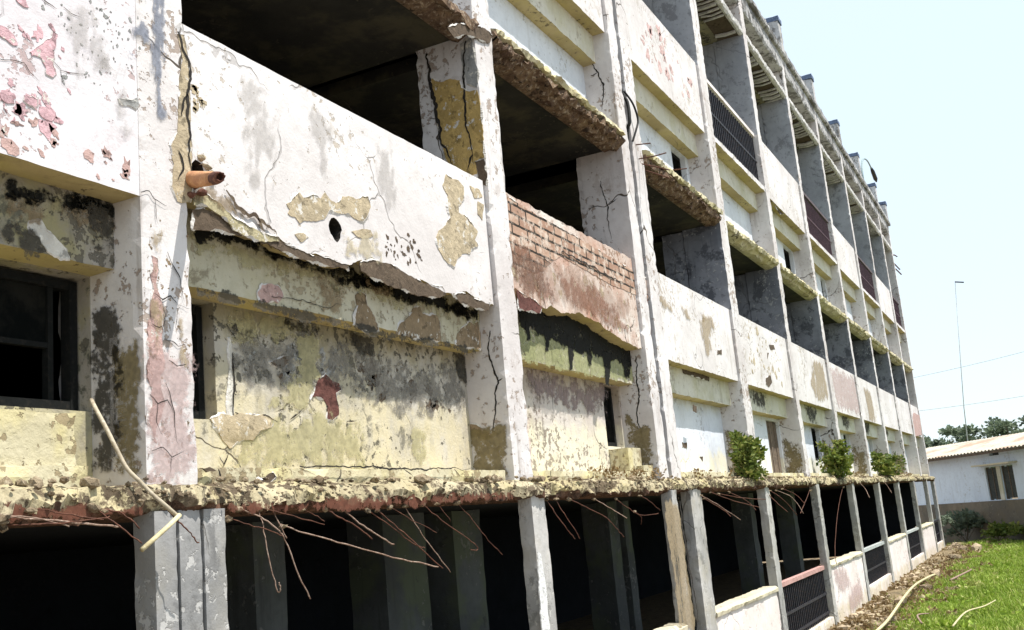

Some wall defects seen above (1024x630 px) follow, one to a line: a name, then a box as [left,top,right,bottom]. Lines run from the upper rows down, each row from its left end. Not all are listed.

peeling [0,0,142,94]
peeling [0,78,64,158]
mould [2,178,115,260]
peeling [83,146,131,181]
crack [177,31,192,179]
flaking render [168,23,492,351]
crack [425,41,473,169]
flaking render [507,197,649,332]
crack [152,254,190,460]
crack [487,332,501,431]
damp [518,311,632,415]
rust [3,502,143,524]